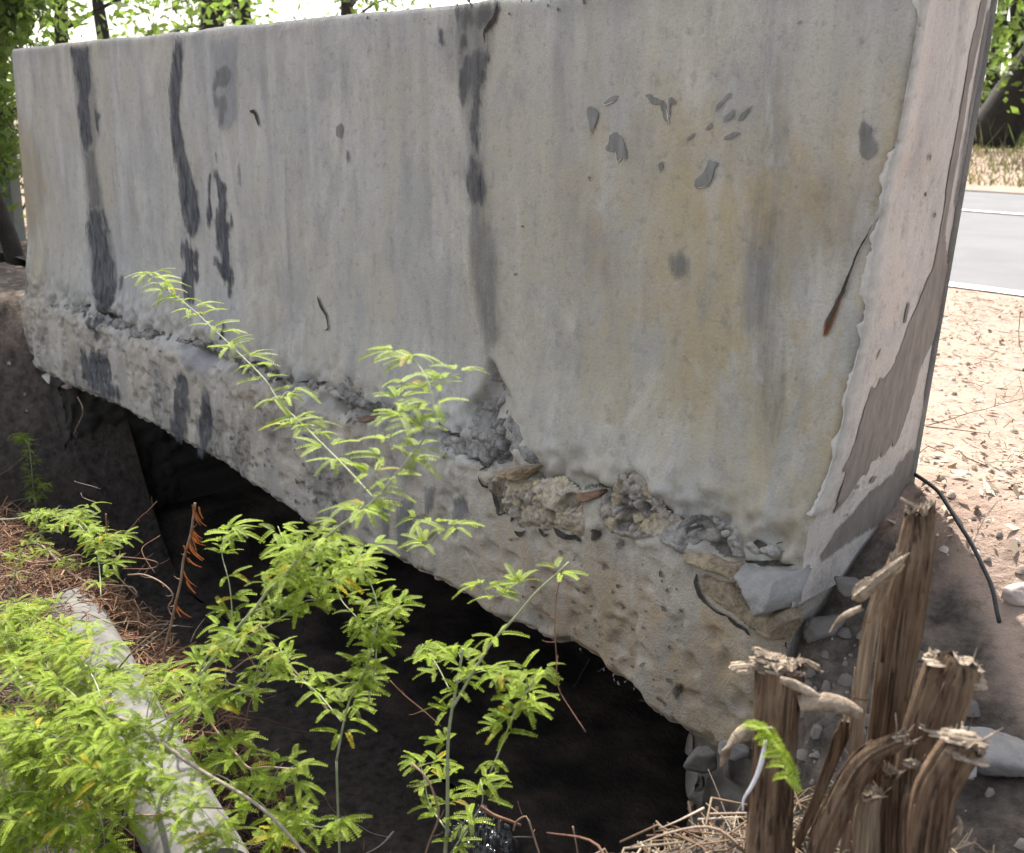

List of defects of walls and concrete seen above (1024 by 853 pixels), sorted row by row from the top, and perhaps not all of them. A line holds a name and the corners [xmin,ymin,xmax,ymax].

damp [71,46,122,400]
damp [170,374,212,456]
damp [168,39,234,305]
spalling [50,301,395,422]
damp [455,1,498,339]
peeling [606,132,627,162]
peeling [646,94,676,124]
spalling [687,93,752,141]
rust [823,298,841,336]
peeling [806,0,988,516]
spalling [440,370,812,643]
crack [693,574,750,636]